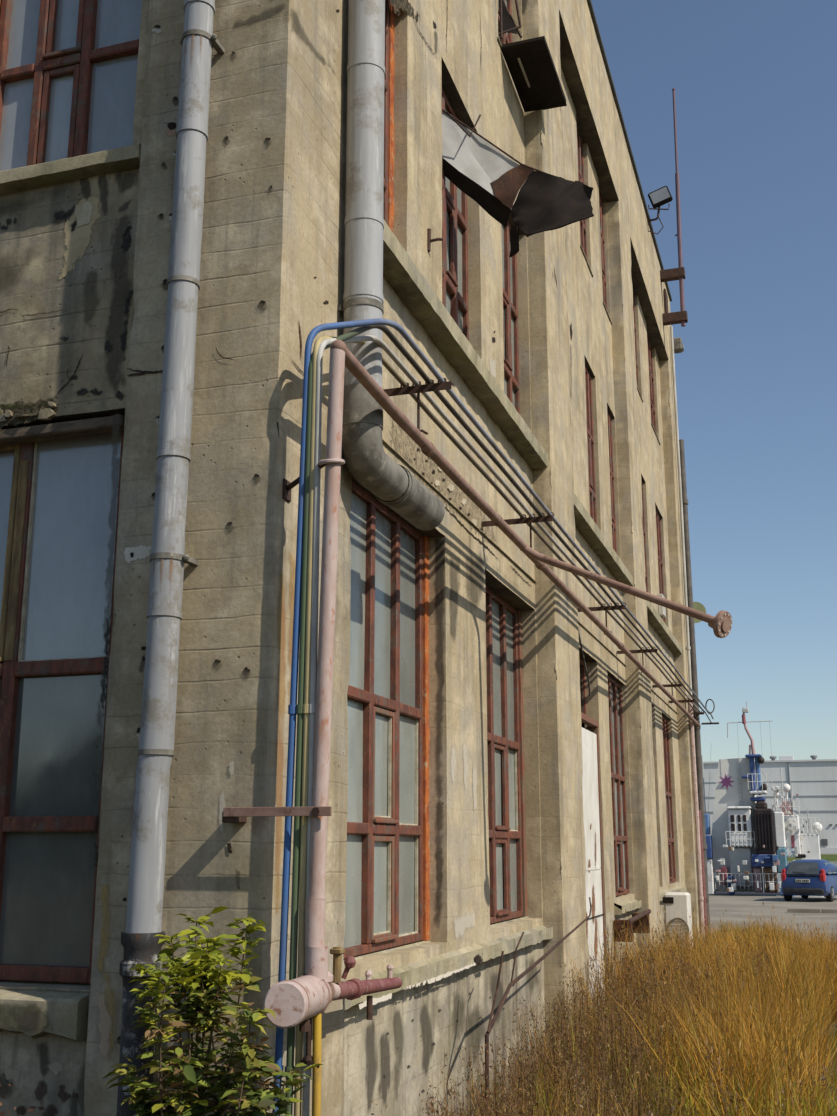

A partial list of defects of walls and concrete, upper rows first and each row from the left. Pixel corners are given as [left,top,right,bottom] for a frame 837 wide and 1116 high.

peeling [59,194,101,280]
crack [0,308,66,316]
leakage [54,172,137,400]
spalling [0,396,58,431]
peeling [390,420,496,542]
leakage [95,413,121,748]
leakage [0,1004,48,1076]
leakage [366,1005,441,1109]
leakage [455,975,515,1058]